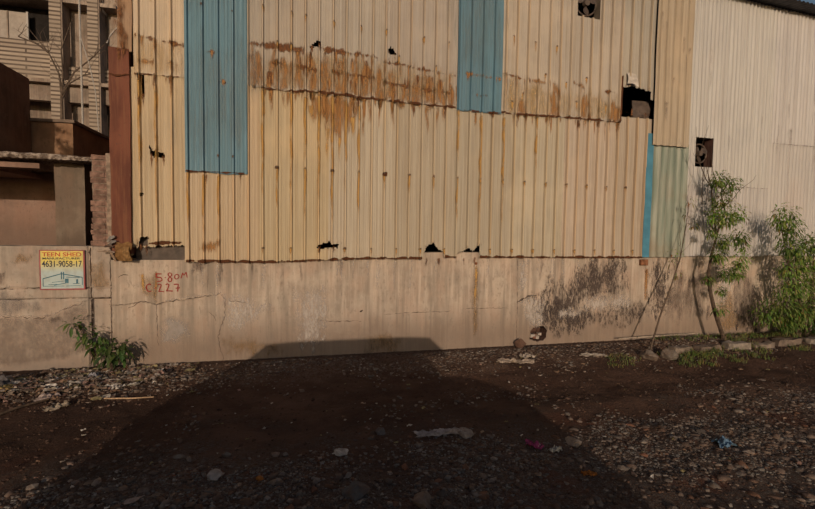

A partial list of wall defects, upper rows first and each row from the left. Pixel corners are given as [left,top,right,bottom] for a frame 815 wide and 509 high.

rust [247,40,460,208]
rust [467,72,633,195]
rust [137,241,181,254]
crack [116,293,240,359]
spalling [528,325,548,343]
water stain [525,258,701,336]